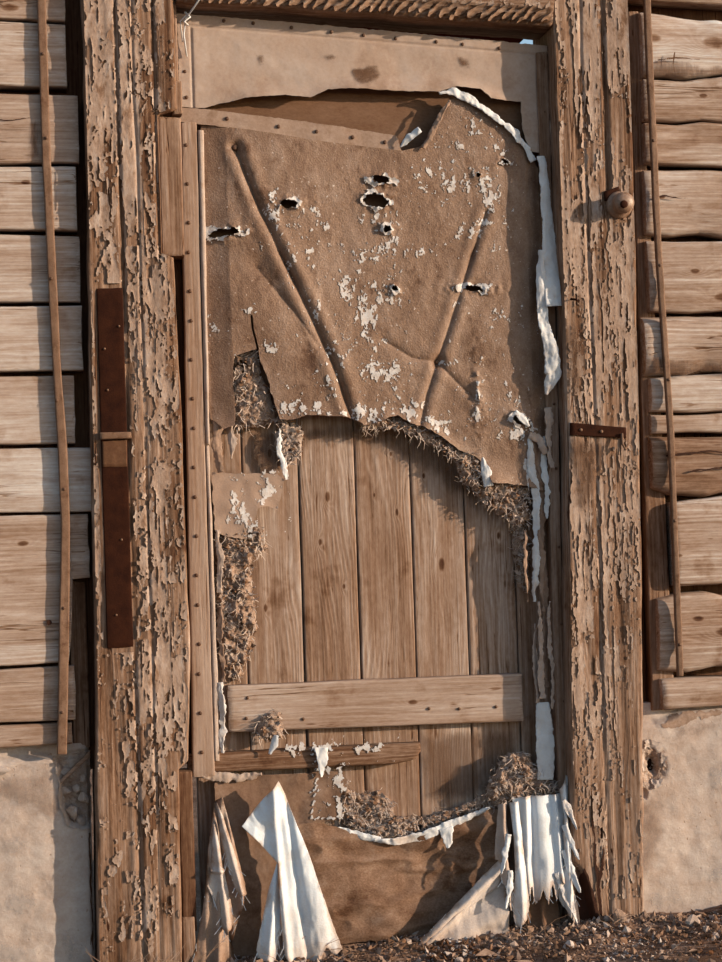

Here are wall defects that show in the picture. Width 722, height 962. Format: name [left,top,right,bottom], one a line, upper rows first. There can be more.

peeling [52,0,189,956]
peeling [284,735,344,762]
peeling [354,739,384,755]
peeling [448,0,668,899]